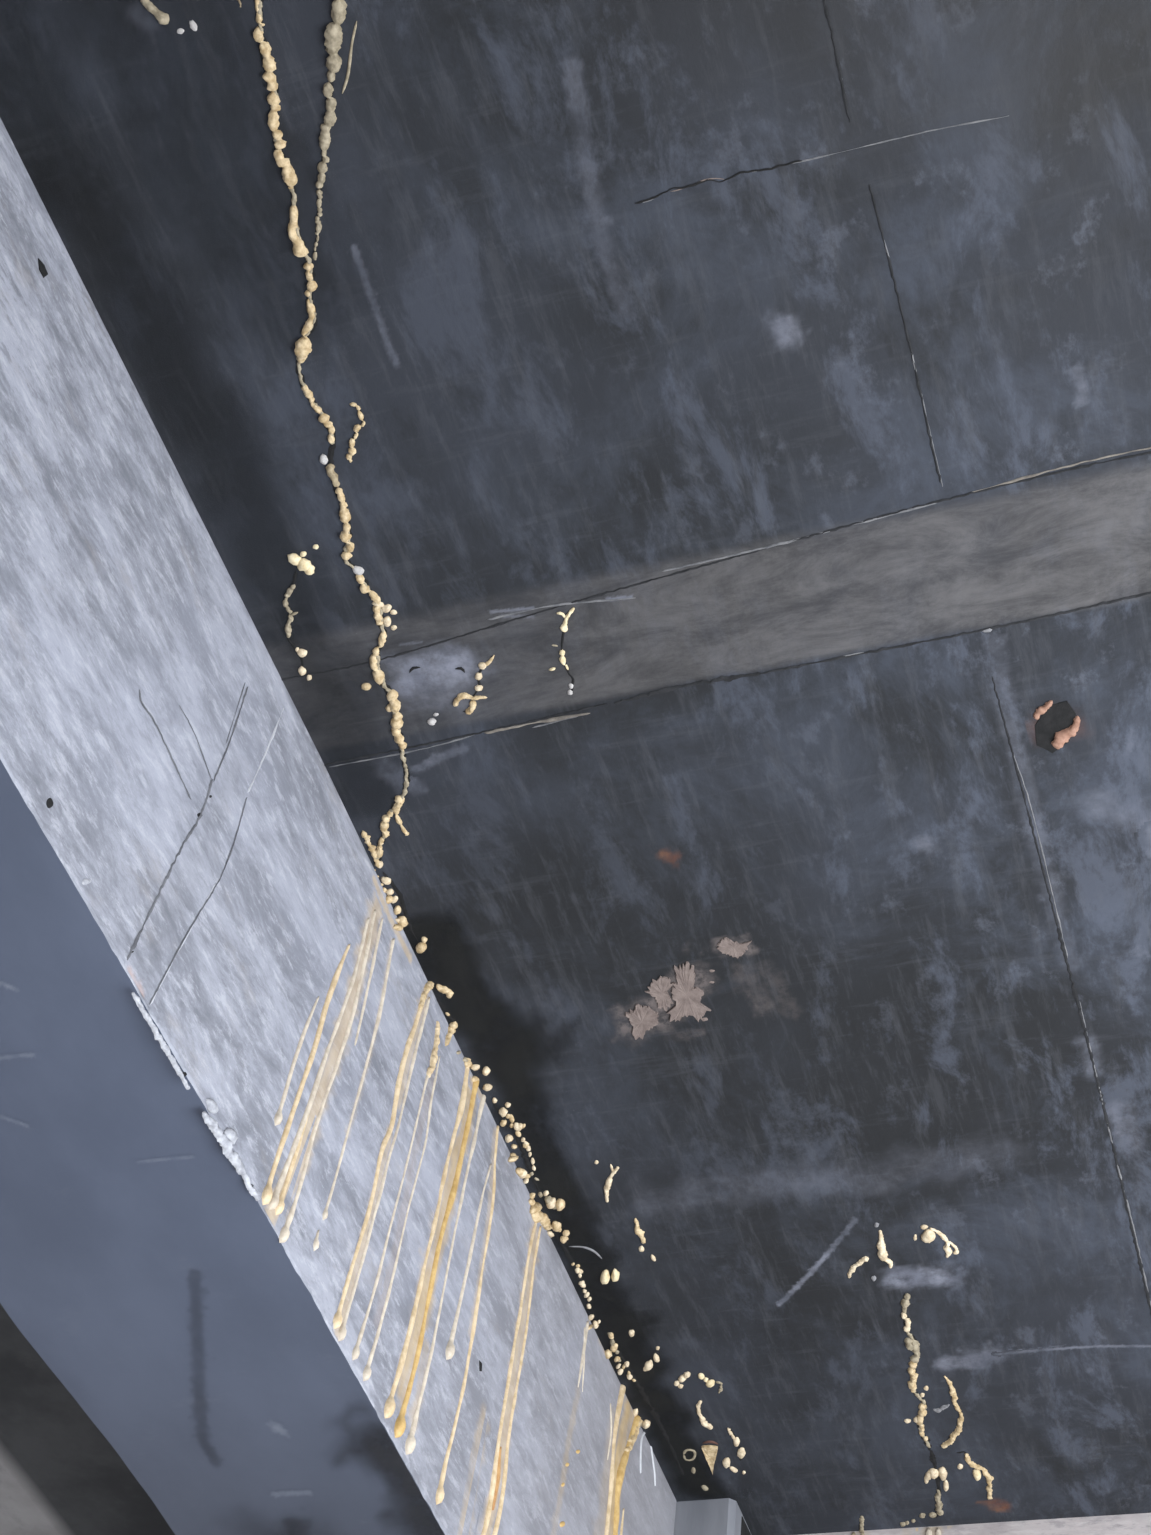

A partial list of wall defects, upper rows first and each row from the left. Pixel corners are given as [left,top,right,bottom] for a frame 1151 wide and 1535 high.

crack [123,0,1151,1315]
spalling [1023,696,1099,753]
water stain [901,829,949,859]
water stain [1064,776,1151,872]
peeling [592,930,808,1053]
water stain [365,839,725,1498]
water stain [594,1110,1040,1261]
water stain [847,1223,974,1295]
water stain [353,1428,444,1535]
crack [696,1400,746,1474]
crack [901,1293,994,1519]